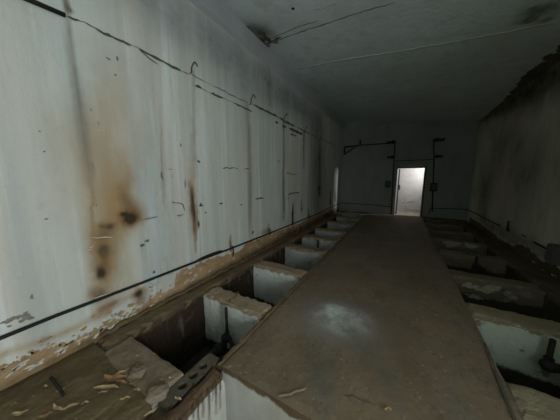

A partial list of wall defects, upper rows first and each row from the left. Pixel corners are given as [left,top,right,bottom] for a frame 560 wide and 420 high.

corrosion [86,136,141,280]
corrosion [190,187,200,235]
peeling [0,208,339,391]
damp [315,304,366,335]